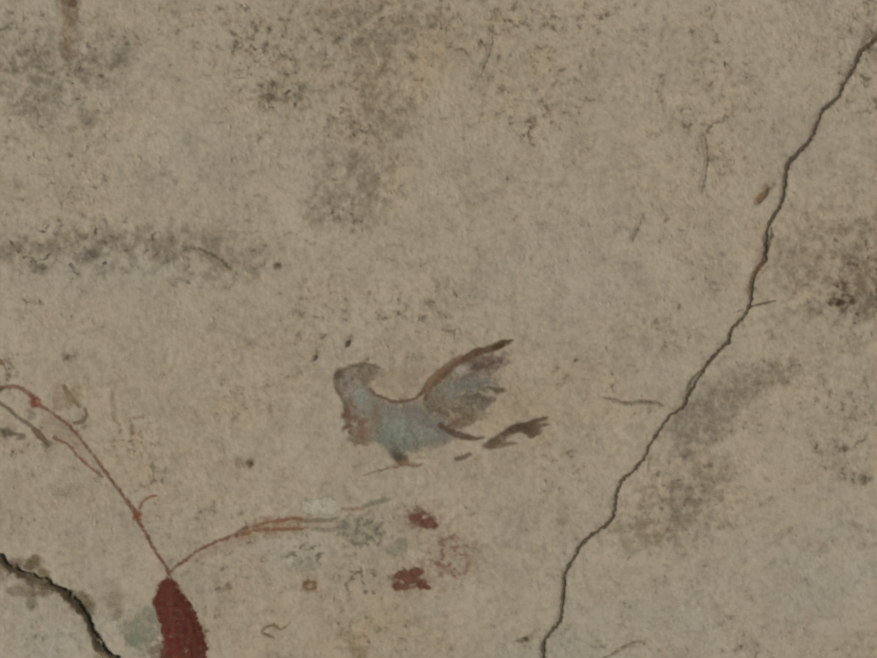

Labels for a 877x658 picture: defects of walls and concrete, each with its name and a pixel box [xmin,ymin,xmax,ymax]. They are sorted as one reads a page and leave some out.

crack [0,554,119,658]
crack [541,34,877,658]